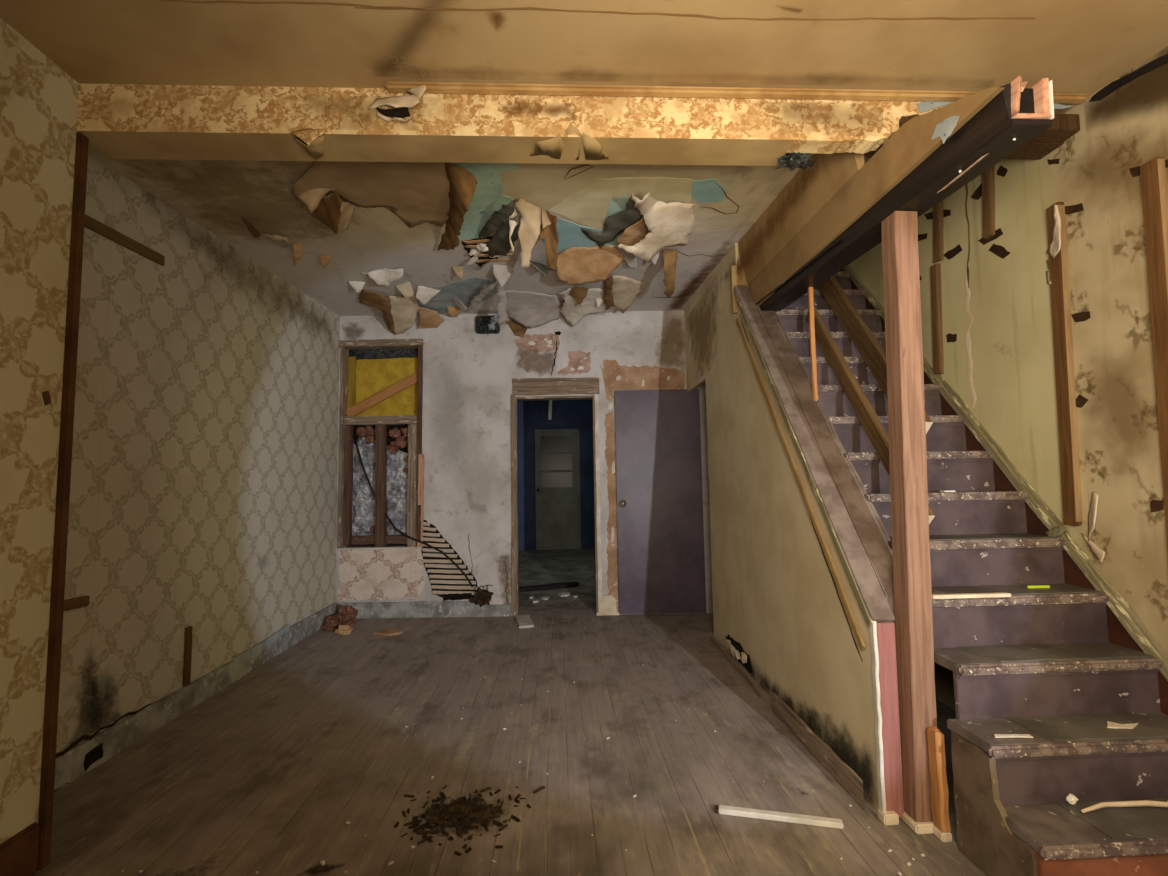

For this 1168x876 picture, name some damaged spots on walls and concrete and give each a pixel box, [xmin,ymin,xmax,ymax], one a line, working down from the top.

flaking render [453,163,519,240]
flaking render [543,177,727,251]
flaking render [417,277,498,314]
peeling [514,331,685,612]
mould [80,661,117,734]